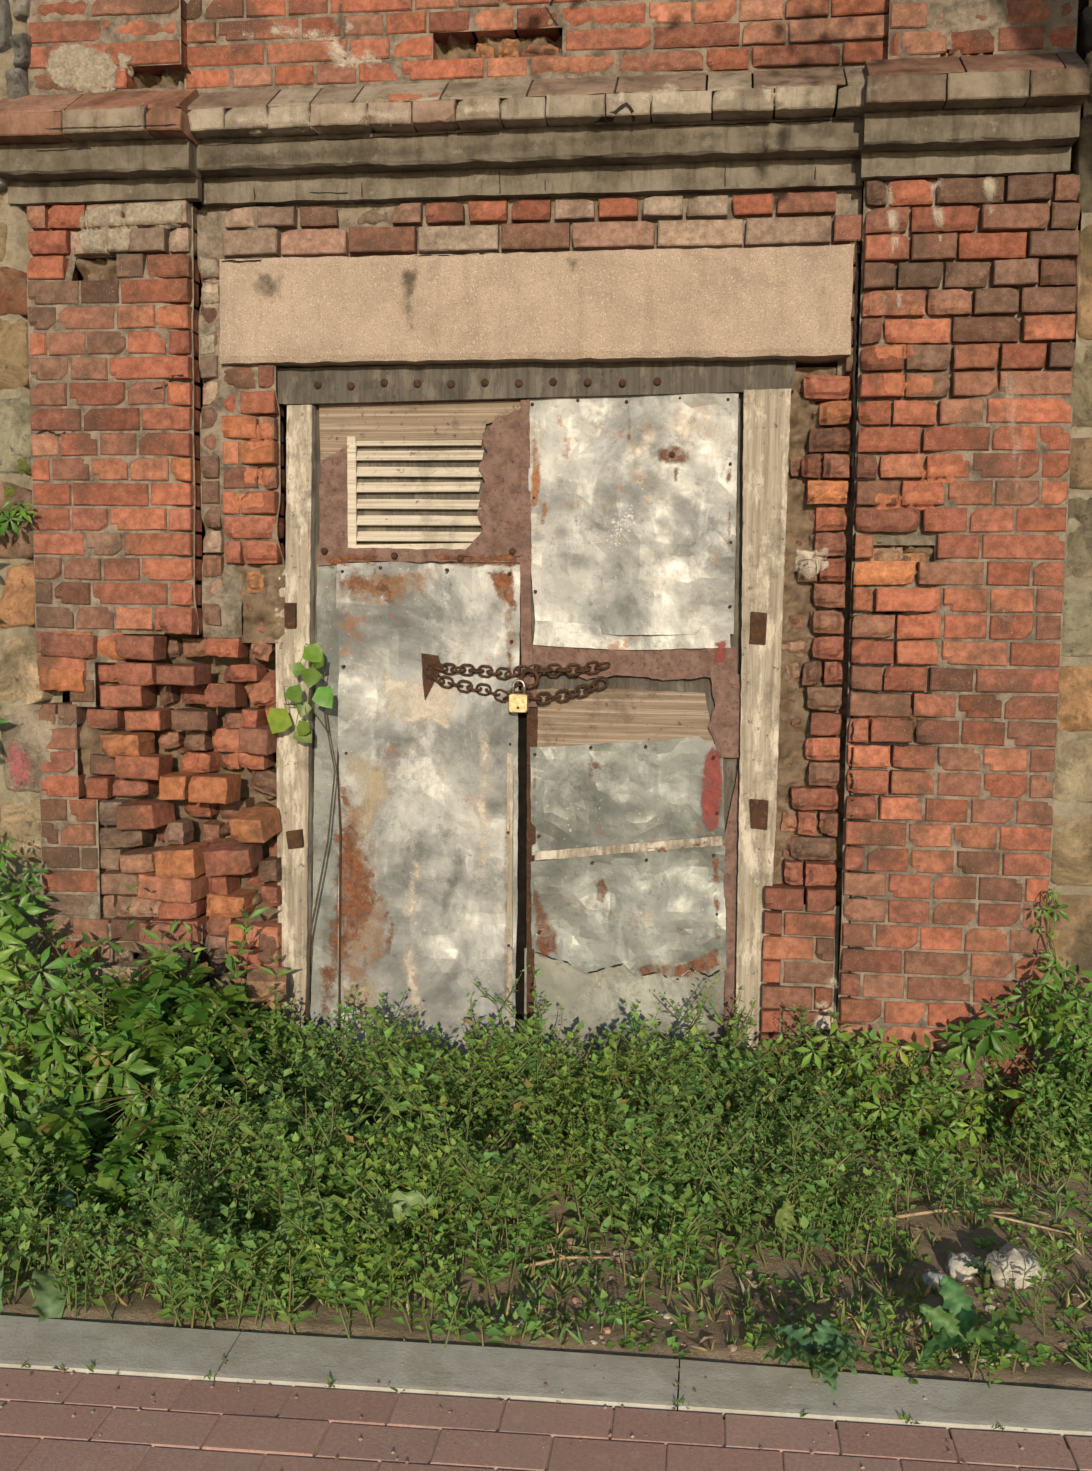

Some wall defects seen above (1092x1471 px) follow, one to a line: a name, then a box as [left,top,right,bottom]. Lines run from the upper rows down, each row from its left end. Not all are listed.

spalling [435,34,562,60]
spalling [875,344,933,396]
rust [531,439,547,521]
rust [659,447,686,479]
spalling [875,466,954,510]
rust [329,551,422,601]
rust [435,555,517,669]
spalling [773,367,935,901]
rust [319,788,393,1011]
rust [534,891,556,957]
rust [637,937,720,977]